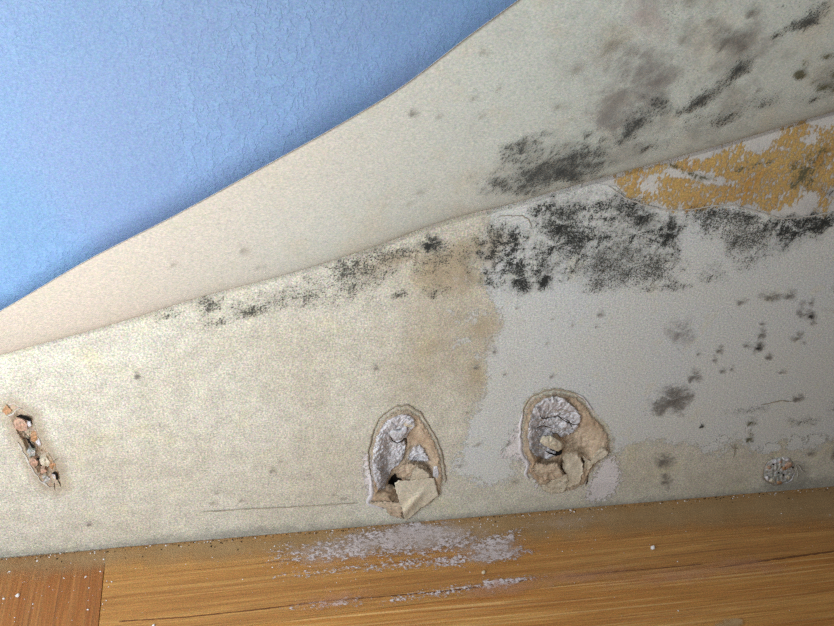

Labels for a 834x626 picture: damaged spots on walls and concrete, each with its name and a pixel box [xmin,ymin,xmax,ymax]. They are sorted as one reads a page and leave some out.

leakage [770,2,831,39]
peeling [0,0,834,355]
leakage [195,19,834,328]
spalling [2,404,61,490]
spalling [361,404,447,521]
peeling [449,183,834,504]
leakage [652,372,702,416]